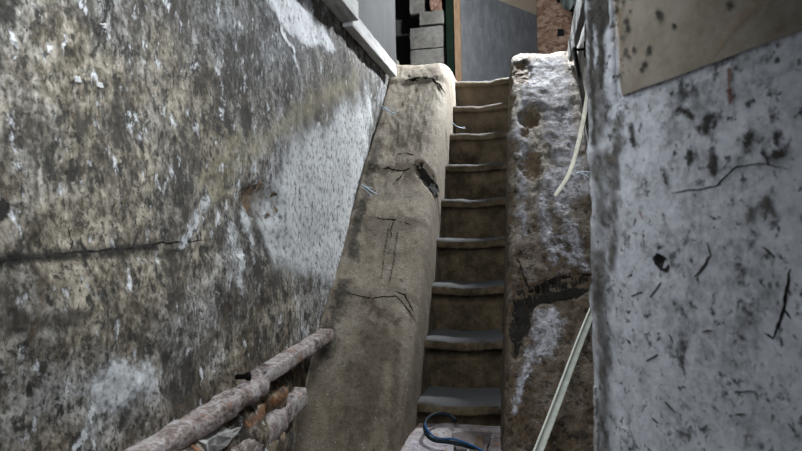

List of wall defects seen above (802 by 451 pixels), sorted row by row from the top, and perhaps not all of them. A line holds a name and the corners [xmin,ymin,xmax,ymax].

crack [406,77,445,93]
crack [383,152,415,181]
water stain [509,0,631,451]
crack [65,228,131,253]
crack [153,238,206,246]
crack [350,291,417,322]
crack [764,269,791,340]